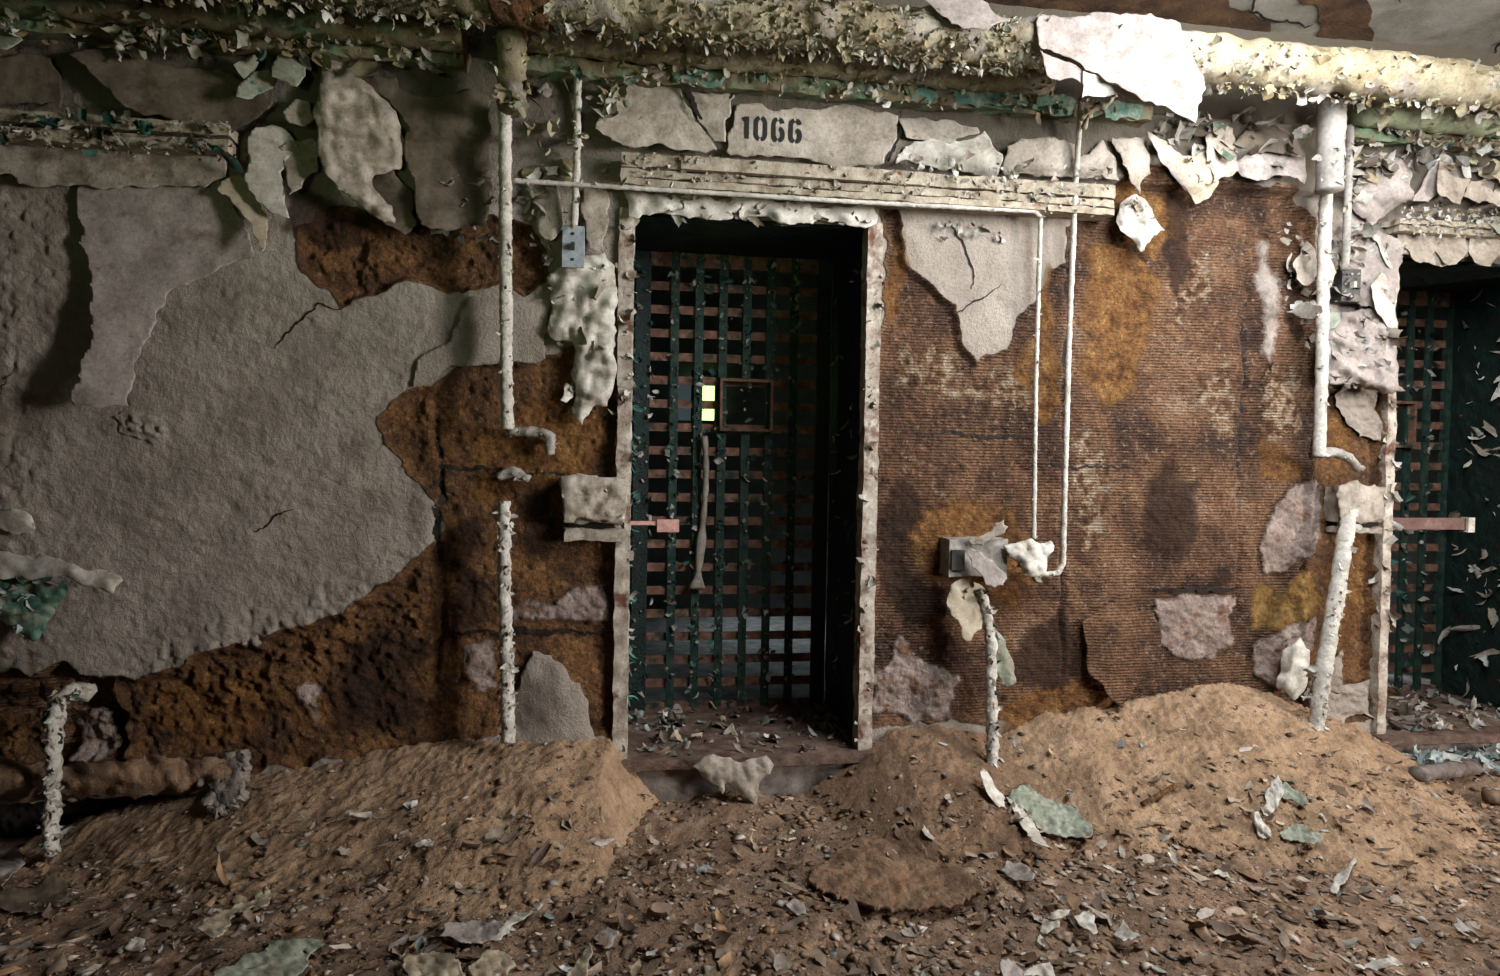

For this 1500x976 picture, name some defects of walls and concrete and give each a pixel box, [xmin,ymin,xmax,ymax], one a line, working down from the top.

spalling [508,0,1500,772]
peeling [693,754,774,804]